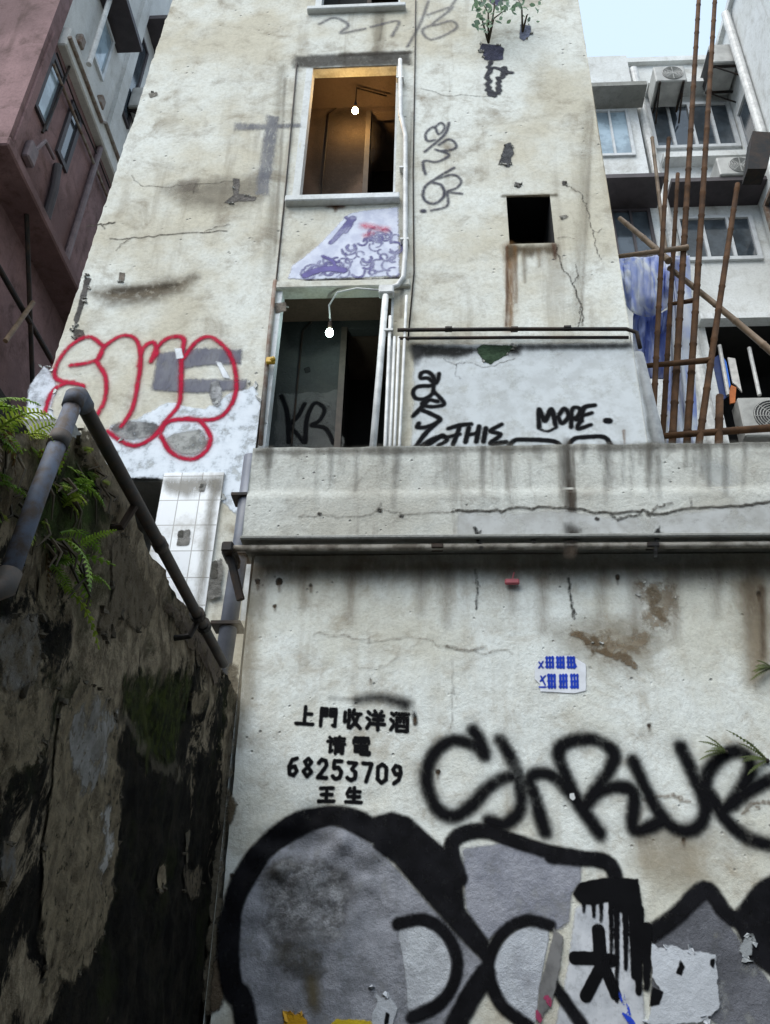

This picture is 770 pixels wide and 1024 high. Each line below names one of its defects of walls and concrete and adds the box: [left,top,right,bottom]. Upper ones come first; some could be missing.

crack [86,222,219,243]
damp [101,279,188,301]
rust [506,244,516,327]
peeling [25,364,57,419]
peeling [108,380,344,513]
damp [565,439,577,513]
crack [452,500,770,550]